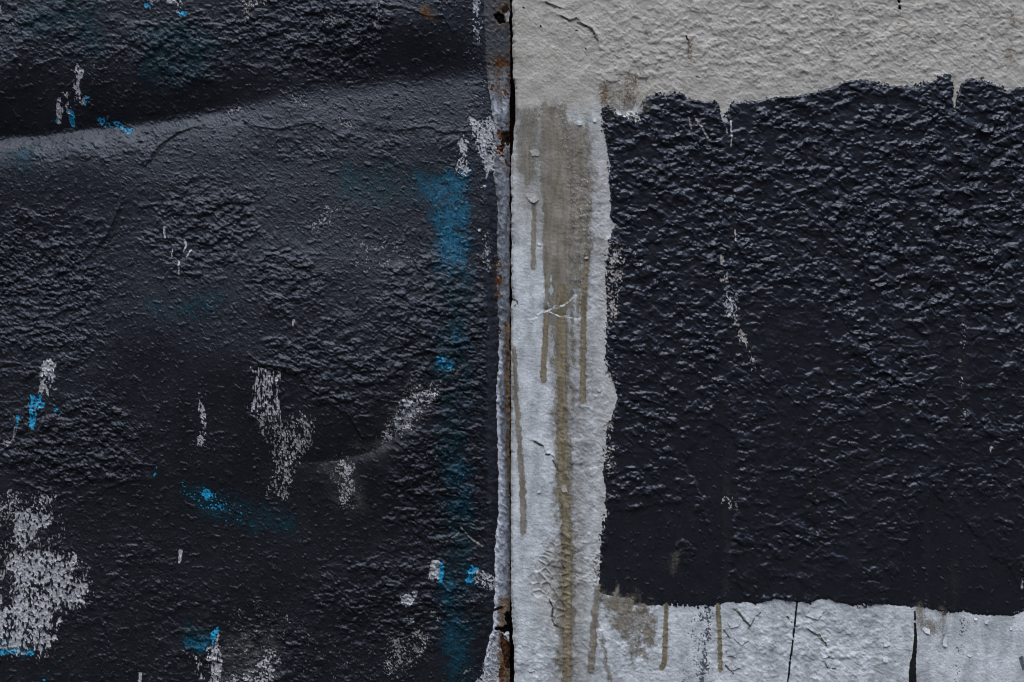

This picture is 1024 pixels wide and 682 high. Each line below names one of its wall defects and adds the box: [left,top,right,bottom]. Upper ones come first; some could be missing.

peeling [468,0,482,67]
peeling [435,80,499,262]
corrosion [494,131,510,167]
peeling [247,366,316,501]
corrosion [498,322,511,479]
water stain [512,347,527,535]
water stain [516,101,601,682]
peeling [0,489,94,660]
corrosion [497,597,510,682]
water stain [587,584,669,682]
crack [786,601,836,682]
crack [909,611,917,682]